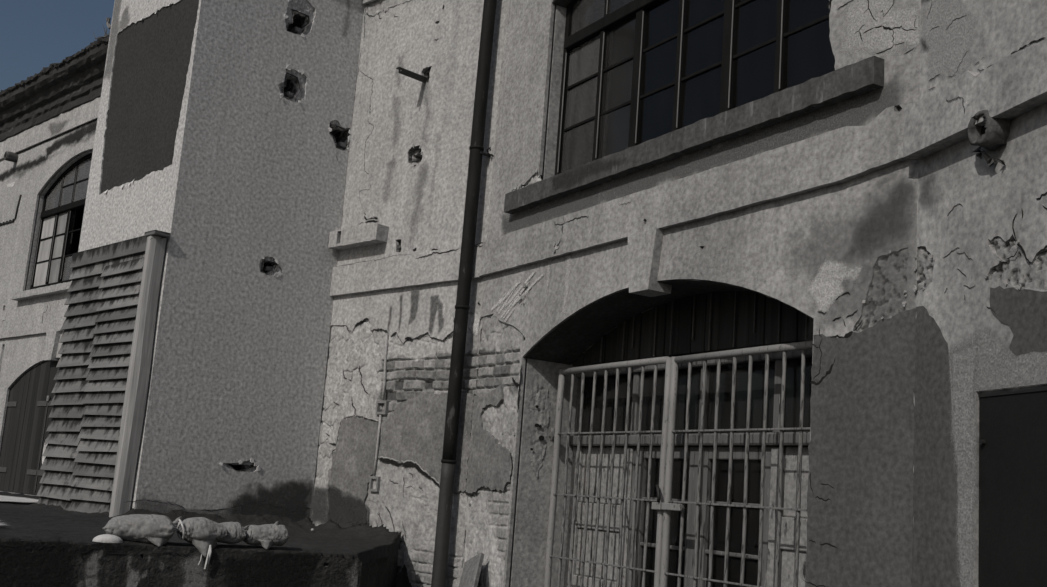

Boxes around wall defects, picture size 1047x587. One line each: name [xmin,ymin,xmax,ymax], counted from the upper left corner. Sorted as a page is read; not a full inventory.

spalling [283,0,315,37]
crack [825,0,966,54]
crack [929,37,1046,114]
spalling [328,117,352,151]
crack [1007,192,1047,263]
flaking render [856,246,935,333]
crack [944,247,995,313]
flaking render [984,236,1047,291]
flaking render [461,303,524,457]
spalling [219,458,261,472]
flaking render [310,319,454,587]
flaking render [446,482,511,587]